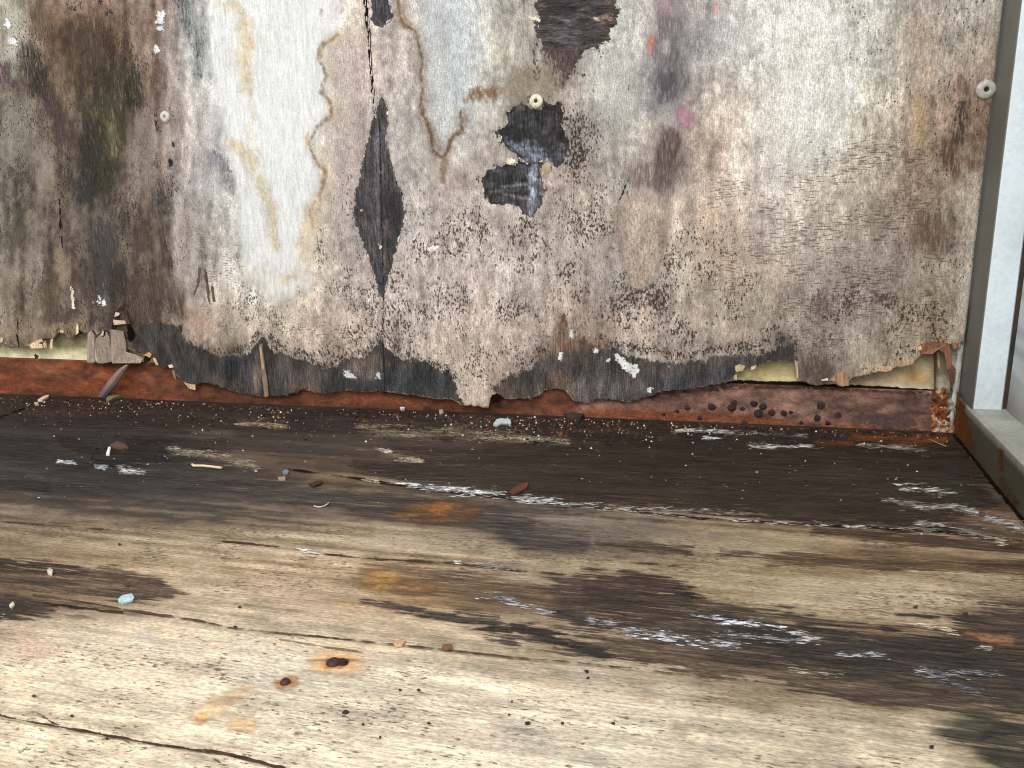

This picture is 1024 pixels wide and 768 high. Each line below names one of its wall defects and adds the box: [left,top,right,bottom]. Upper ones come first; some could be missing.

peeling [531,0,621,88]
water stain [0,0,142,204]
water stain [174,0,341,300]
peeling [473,96,590,226]
peeling [353,94,406,324]
peeling [153,358,196,390]
corrosion [312,393,423,410]
corrosion [579,384,974,455]
peeling [821,372,849,386]
water stain [0,179,1024,768]
corrosion [311,651,360,671]